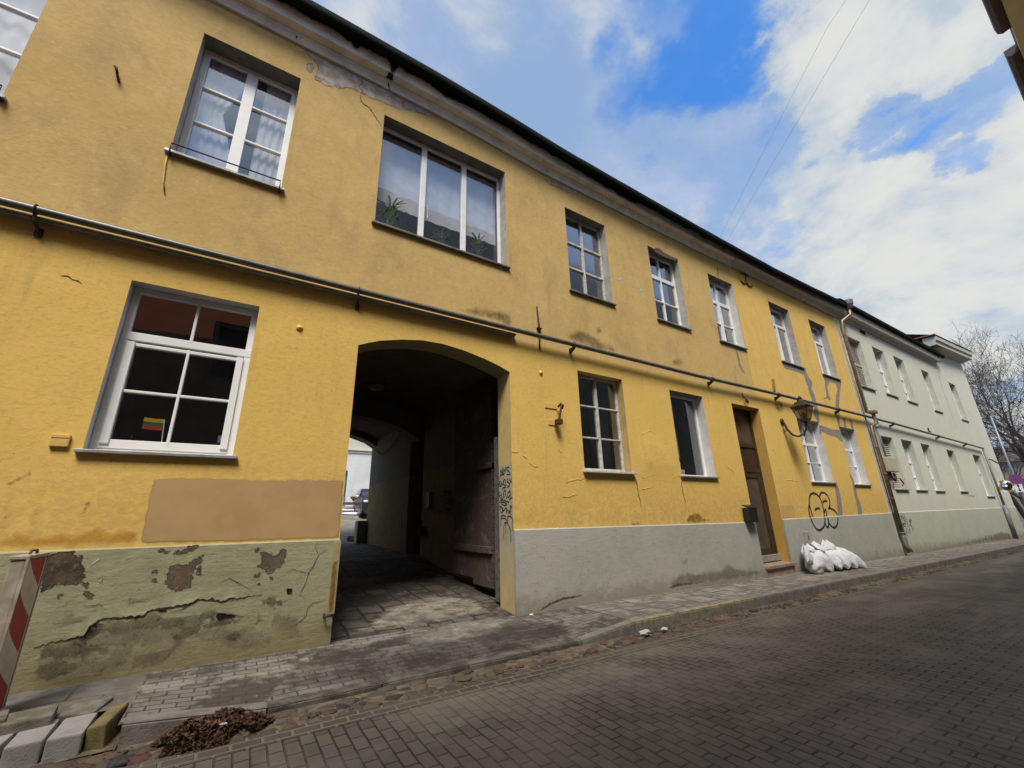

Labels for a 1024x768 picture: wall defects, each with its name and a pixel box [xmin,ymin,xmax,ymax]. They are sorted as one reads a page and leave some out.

peeling [278,0,726,249]
spalling [40,550,94,599]
crack [33,578,262,648]
spalling [150,545,205,591]
spalling [253,547,287,585]
crack [288,543,326,628]